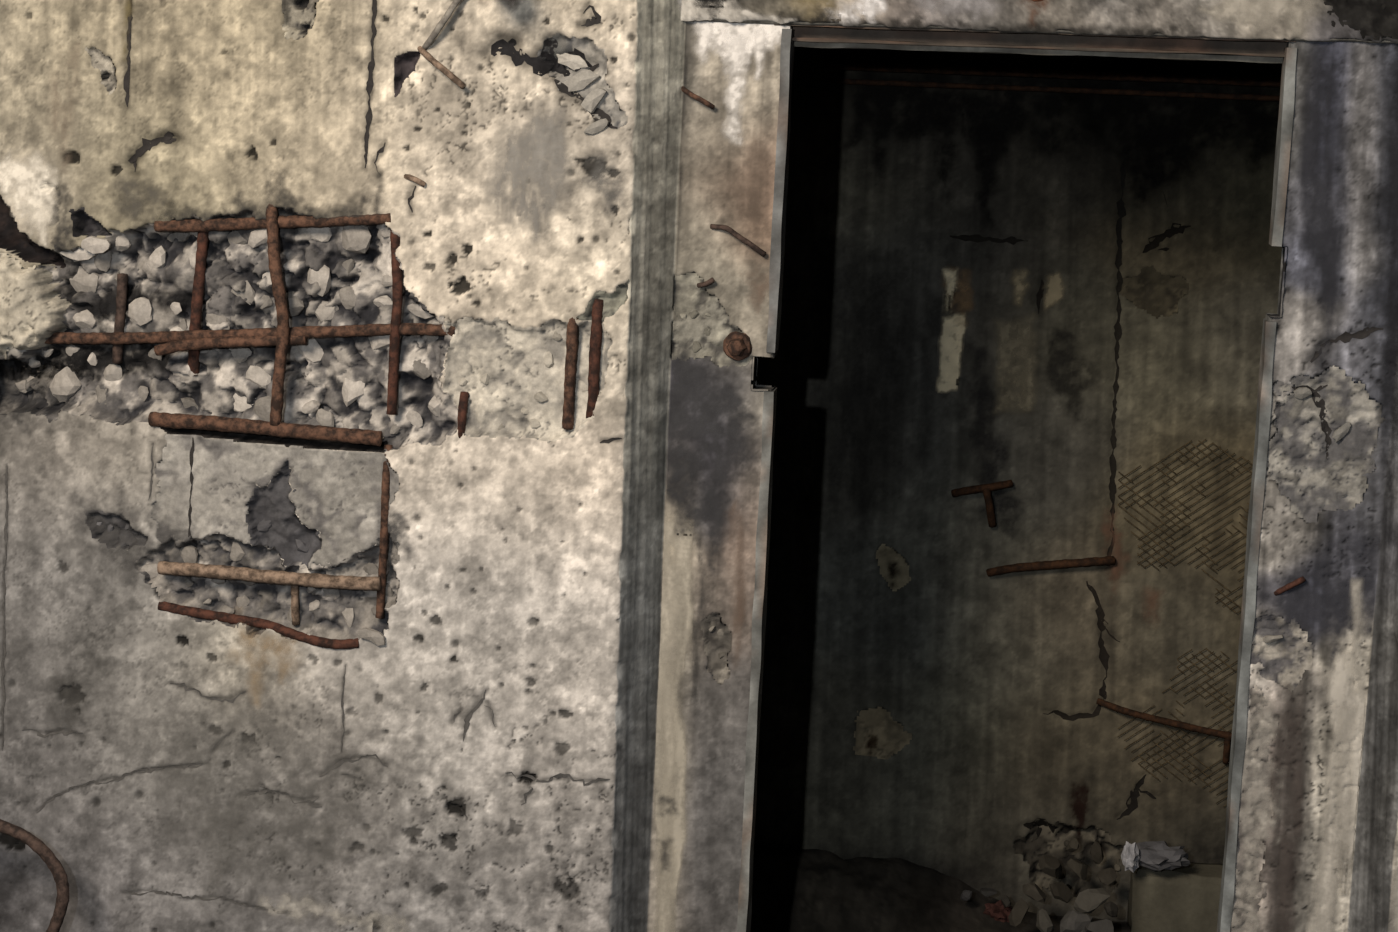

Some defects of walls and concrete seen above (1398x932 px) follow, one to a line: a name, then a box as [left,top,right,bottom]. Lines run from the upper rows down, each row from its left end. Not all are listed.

spalling [0,195,629,649]
crack [1043,154,1191,721]
water stain [1380,349,1397,449]
crack [1117,774,1156,819]
water stain [1231,697,1283,932]
water stain [1308,572,1375,932]